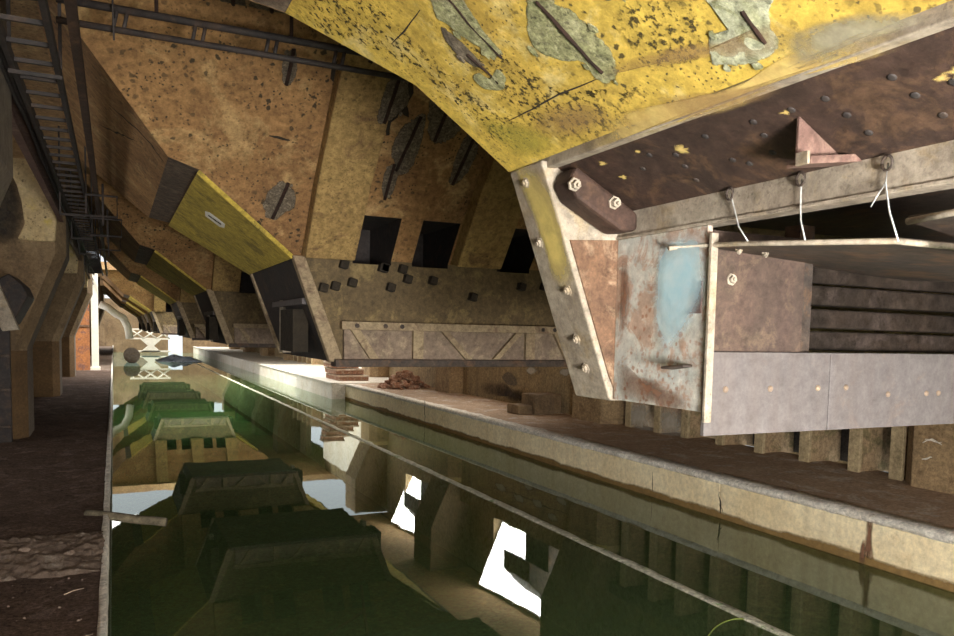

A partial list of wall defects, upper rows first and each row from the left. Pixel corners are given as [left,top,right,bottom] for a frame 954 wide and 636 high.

spalling [430,0,506,91]
spalling [526,0,618,85]
spalling [706,0,779,72]
corrosion [620,267,629,325]
corrosion [626,374,681,407]
corrosion [860,522,873,561]